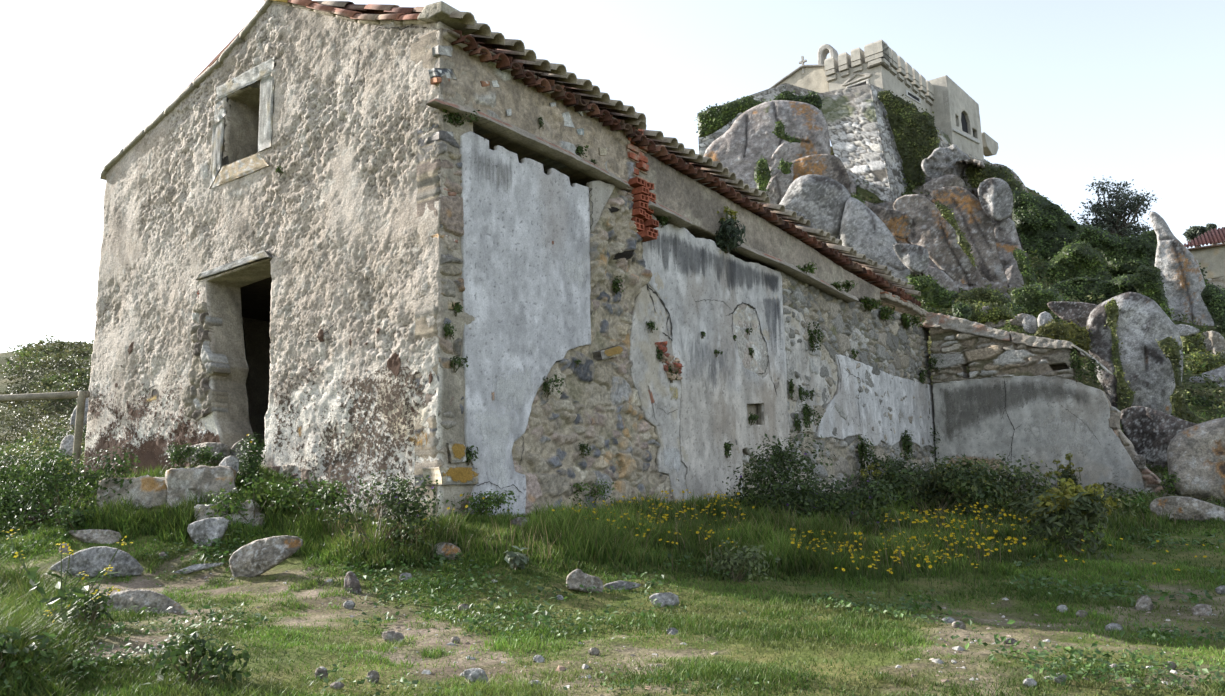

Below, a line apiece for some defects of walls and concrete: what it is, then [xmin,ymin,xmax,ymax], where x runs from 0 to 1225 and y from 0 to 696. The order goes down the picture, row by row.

crack [349,24,413,109]
peeling [83,285,231,478]
peeling [268,352,433,520]
spalling [512,187,679,515]
spalling [655,341,684,380]
leakage [650,236,779,333]